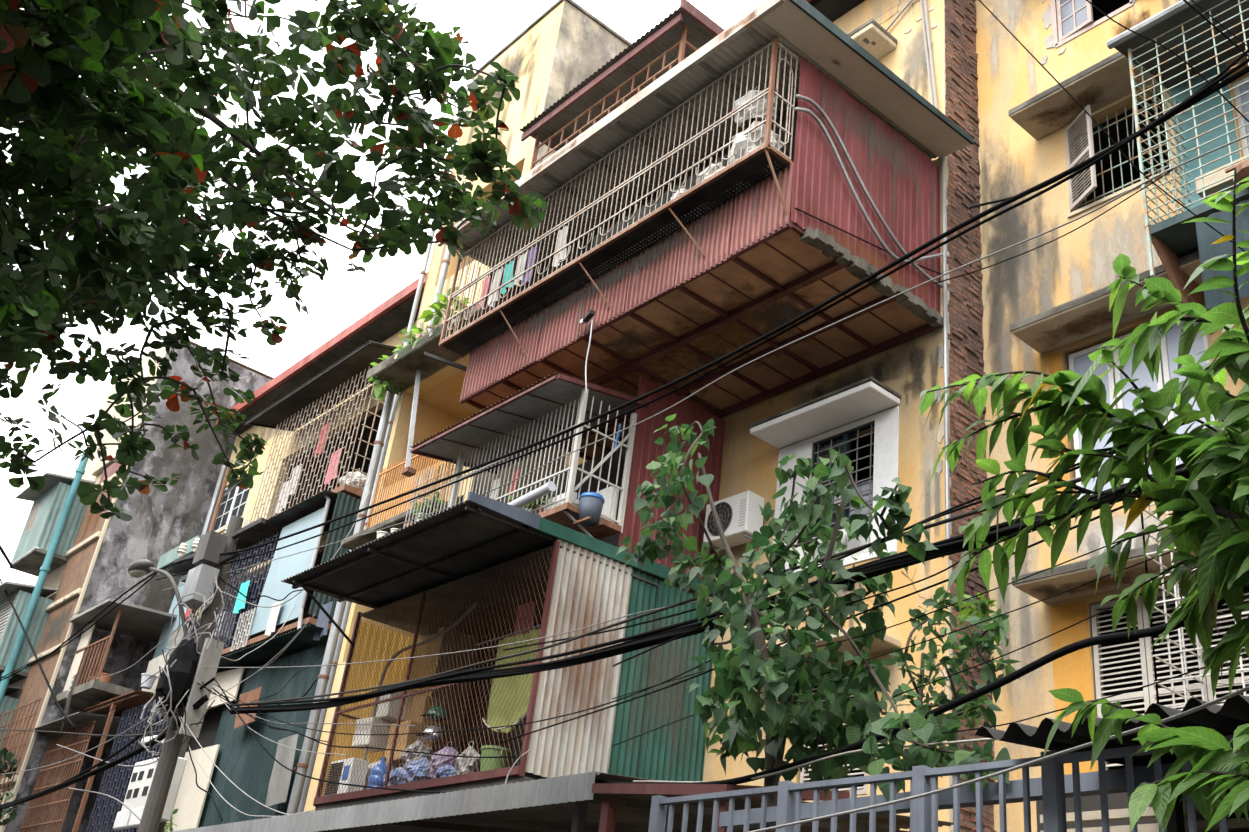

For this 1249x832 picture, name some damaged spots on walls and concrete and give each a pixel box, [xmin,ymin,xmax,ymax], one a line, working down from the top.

peeling [1040,0,1066,65]
water stain [988,176,1159,392]
water stain [145,398,219,476]
water stain [805,353,940,542]
water stain [96,518,180,613]